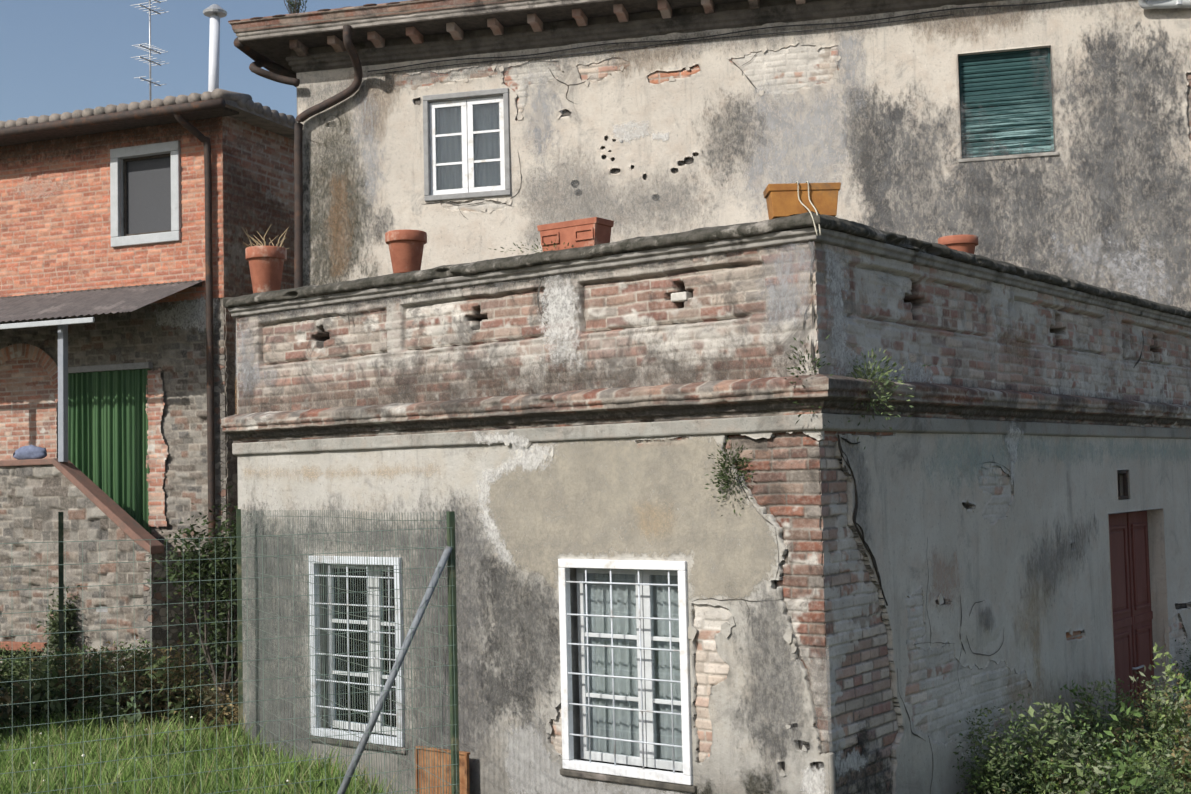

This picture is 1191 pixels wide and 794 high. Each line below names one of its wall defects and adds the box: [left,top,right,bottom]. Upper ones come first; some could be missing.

flaking render [648,65,701,84]
leakage [301,58,508,285]
leakage [525,163,697,232]
spalling [602,136,647,180]
spalling [671,153,699,174]
leakage [702,13,1191,319]
leakage [223,272,799,415]
crack [838,435,888,606]
leakage [226,442,680,794]
flaking render [688,603,736,762]
flaking render [725,431,1034,794]
crack [914,537,966,694]